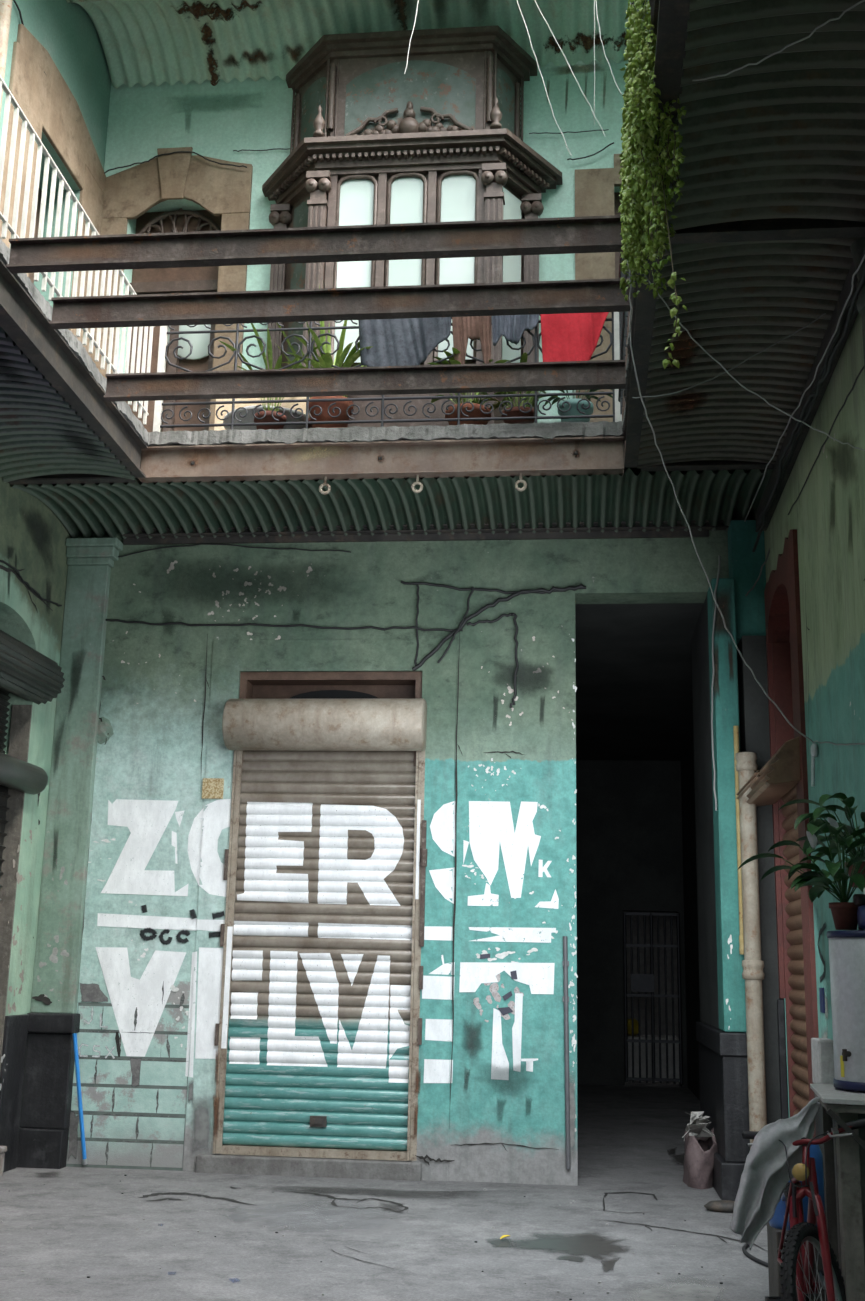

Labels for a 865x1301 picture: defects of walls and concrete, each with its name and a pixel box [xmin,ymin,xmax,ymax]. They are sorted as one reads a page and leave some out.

rust [176,0,268,86]
rust [286,46,302,61]
peeling [208,565,299,640]
peeling [8,905,69,1014]
flaking render [66,981,190,1171]
leakage [489,1234,626,1271]